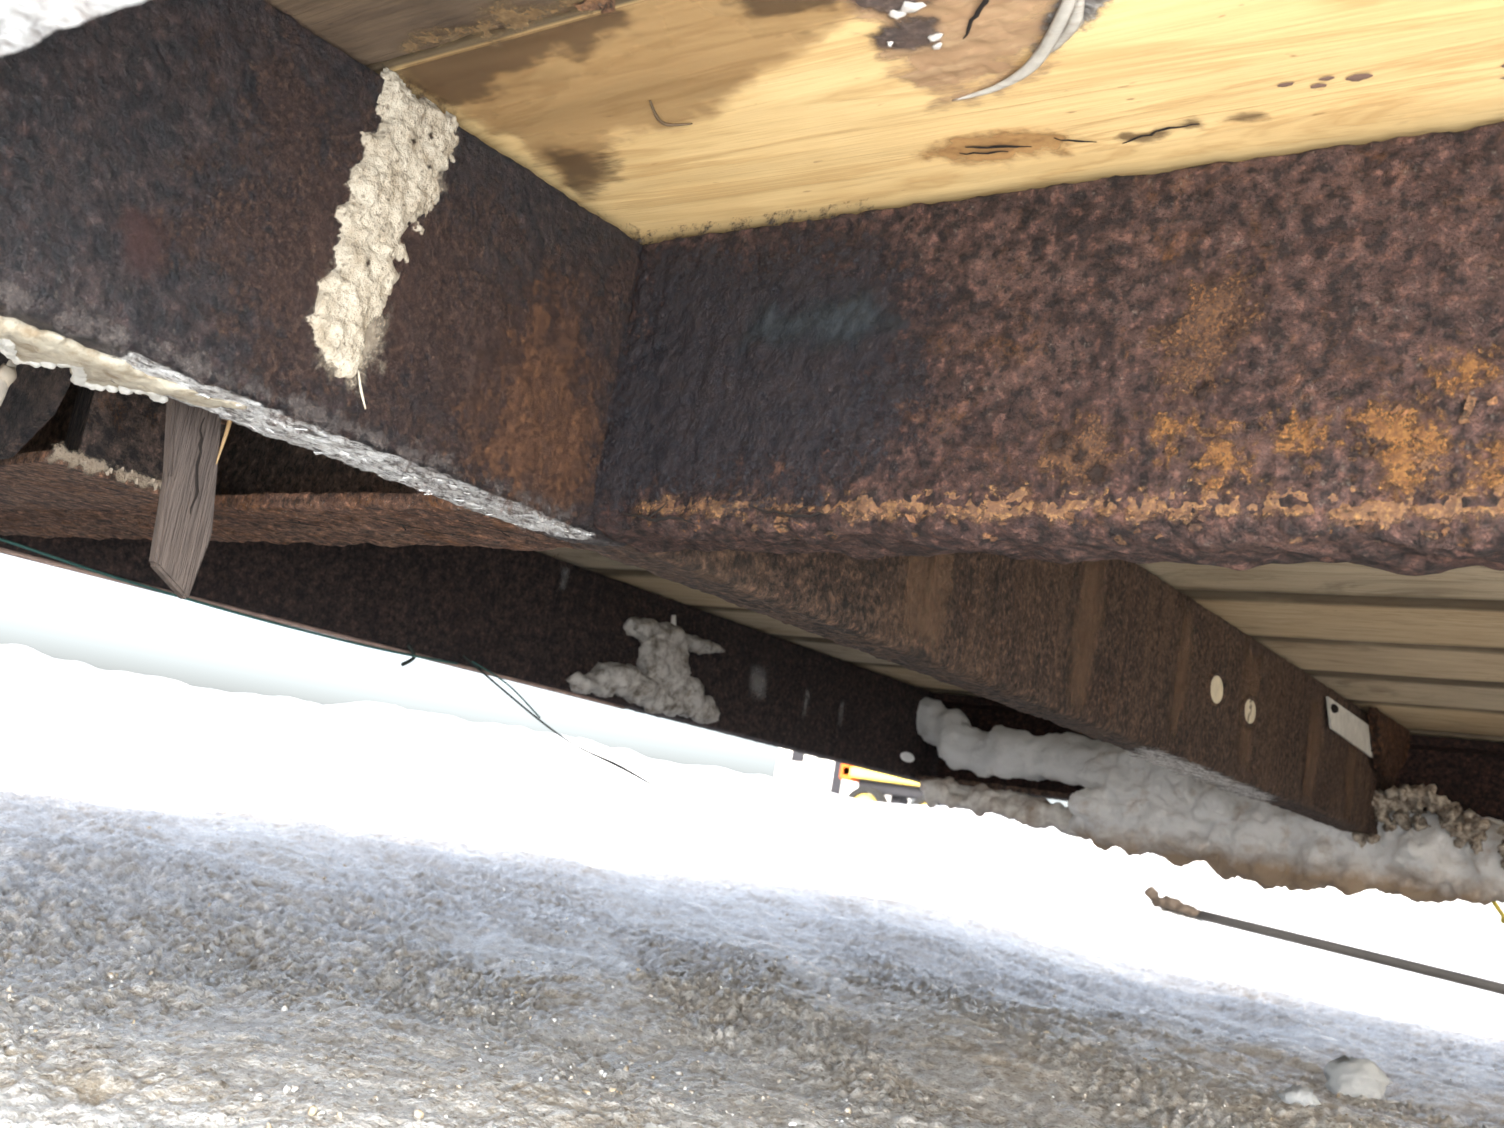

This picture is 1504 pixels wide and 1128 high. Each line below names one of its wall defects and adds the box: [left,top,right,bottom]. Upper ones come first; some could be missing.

leakage [742,0,834,16]
leakage [398,11,626,105]
crack [1120,114,1261,144]
leakage [550,154,613,194]
rust [144,0,639,533]